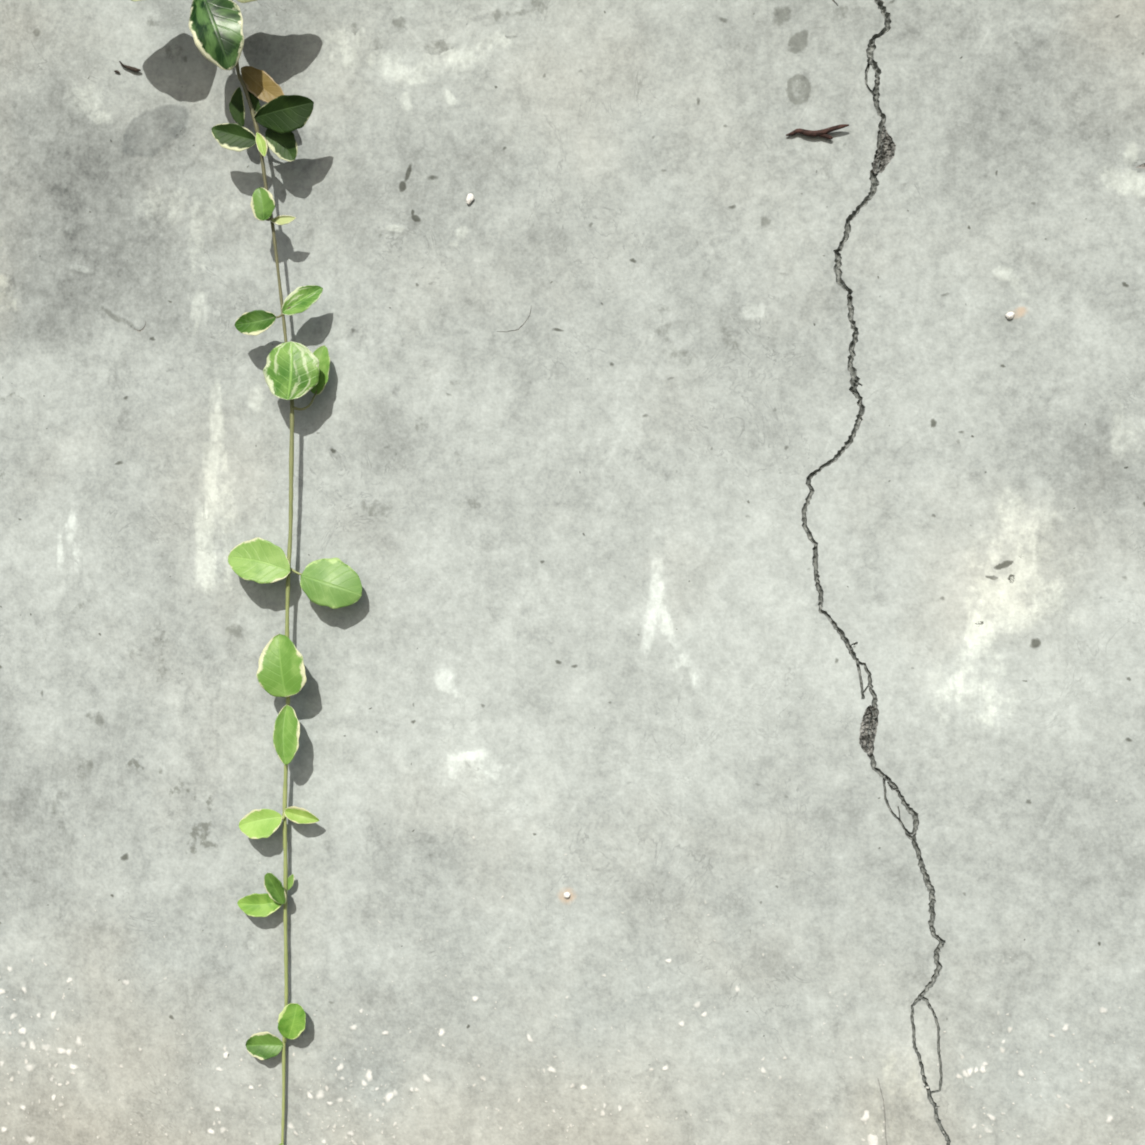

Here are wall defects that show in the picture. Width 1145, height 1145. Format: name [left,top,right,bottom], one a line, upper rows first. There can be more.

crack [801,0,951,1145]